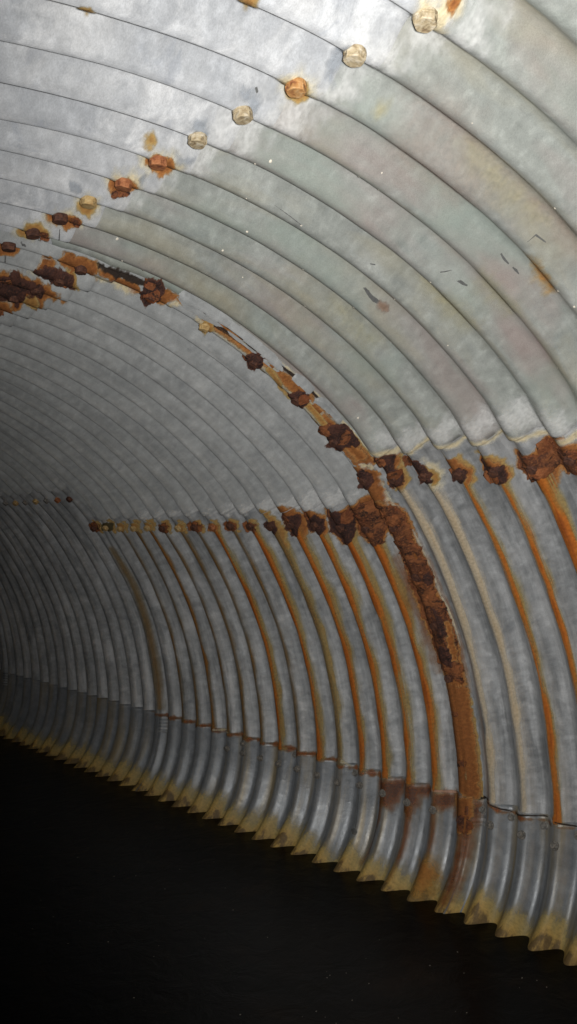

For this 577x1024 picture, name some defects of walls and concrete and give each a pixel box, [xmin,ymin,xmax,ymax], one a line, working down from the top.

corrosion [279,74,314,104]
corrosion [0,132,184,316]
corrosion [88,313,577,905]